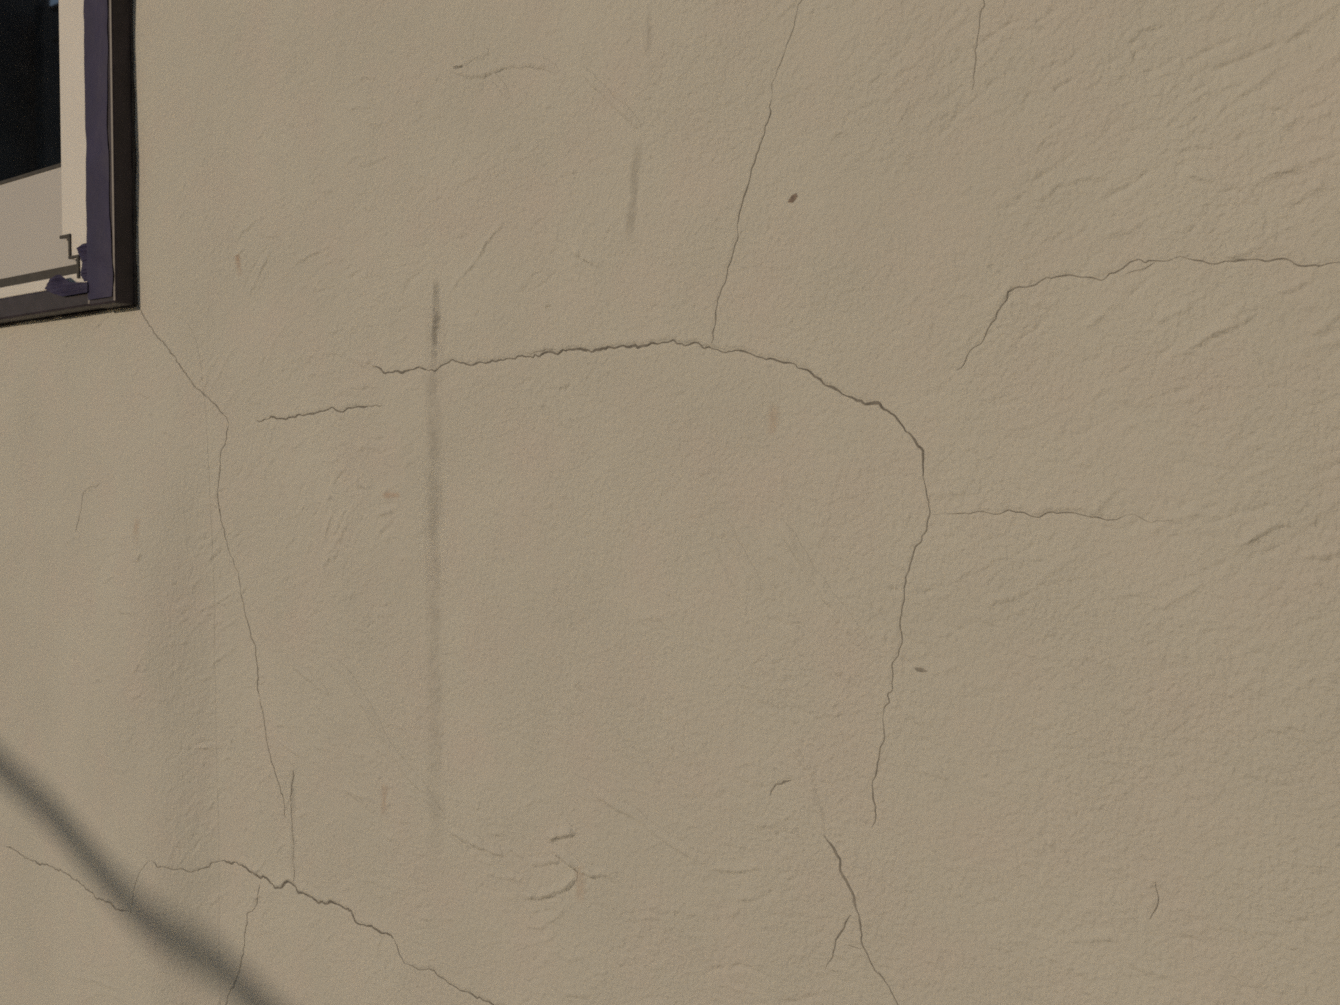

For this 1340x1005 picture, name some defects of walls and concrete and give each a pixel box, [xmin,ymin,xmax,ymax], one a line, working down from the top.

crack [0,303,494,1005]
crack [372,0,1173,826]
crack [824,836,898,1005]
crack [957,256,1339,370]